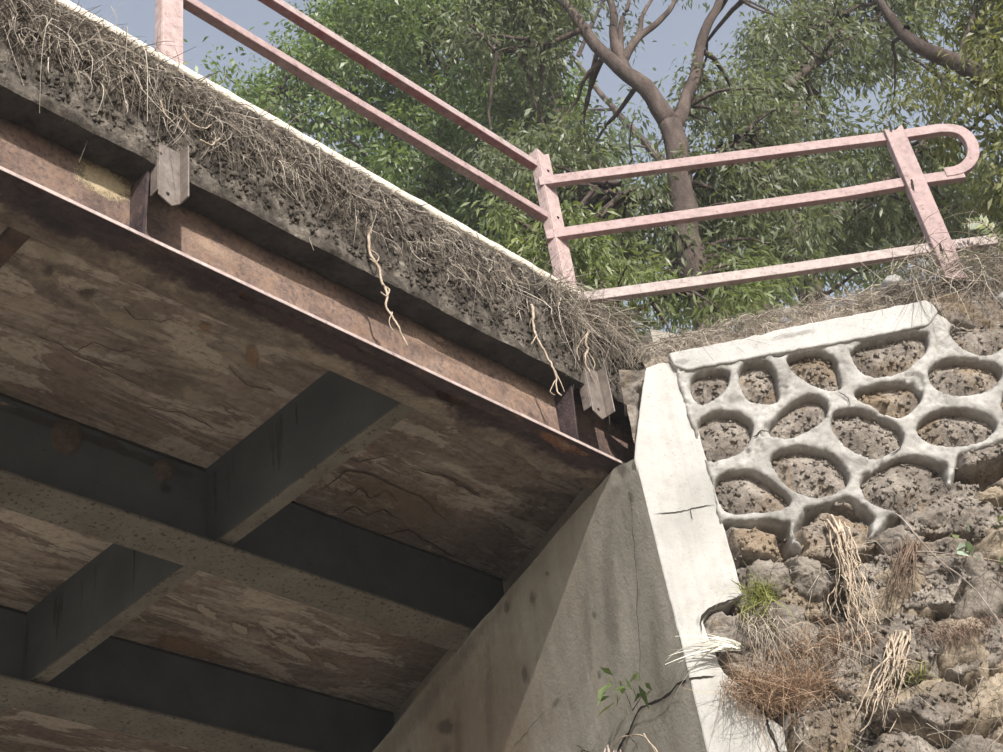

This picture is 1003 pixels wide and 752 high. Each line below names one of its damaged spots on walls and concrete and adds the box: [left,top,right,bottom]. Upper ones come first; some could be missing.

crack [617,675,716,751]
crack [759,692,779,751]